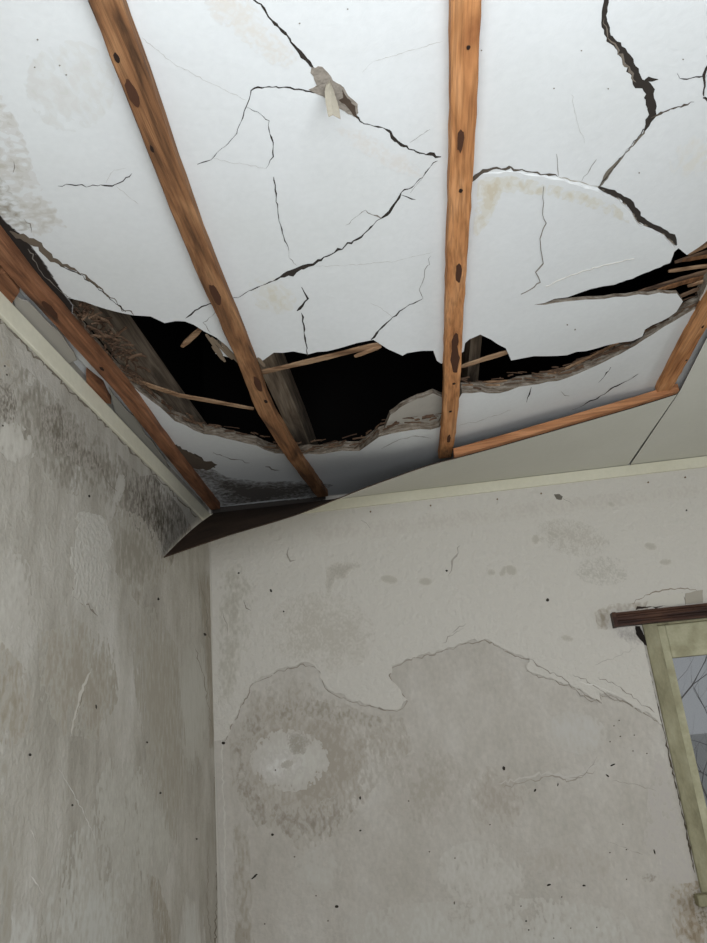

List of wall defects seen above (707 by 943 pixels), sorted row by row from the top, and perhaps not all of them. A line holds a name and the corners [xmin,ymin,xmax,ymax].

mould [0,95,73,314]
leakage [23,40,115,132]
crack [61,168,138,204]
crack [253,0,314,68]
crack [144,39,441,356]
crack [472,0,707,295]
flaking render [176,446,217,470]
leakage [0,350,191,844]
peeling [204,467,707,744]
leakage [0,619,118,943]
leakage [229,592,618,943]